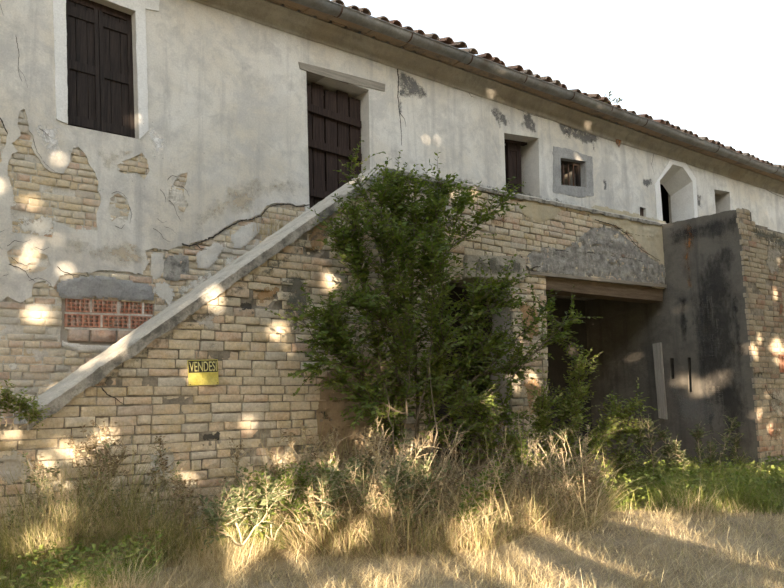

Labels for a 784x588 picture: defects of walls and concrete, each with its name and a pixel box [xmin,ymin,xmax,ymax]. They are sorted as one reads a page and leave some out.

crack [397,69,406,145]
leakage [400,73,426,112]
leakage [522,114,535,132]
leakage [559,124,598,149]
flaking render [117,153,149,179]
flaking render [0,110,132,282]
flaking render [163,173,189,219]
spalling [239,281,282,314]
leakage [681,250,742,431]